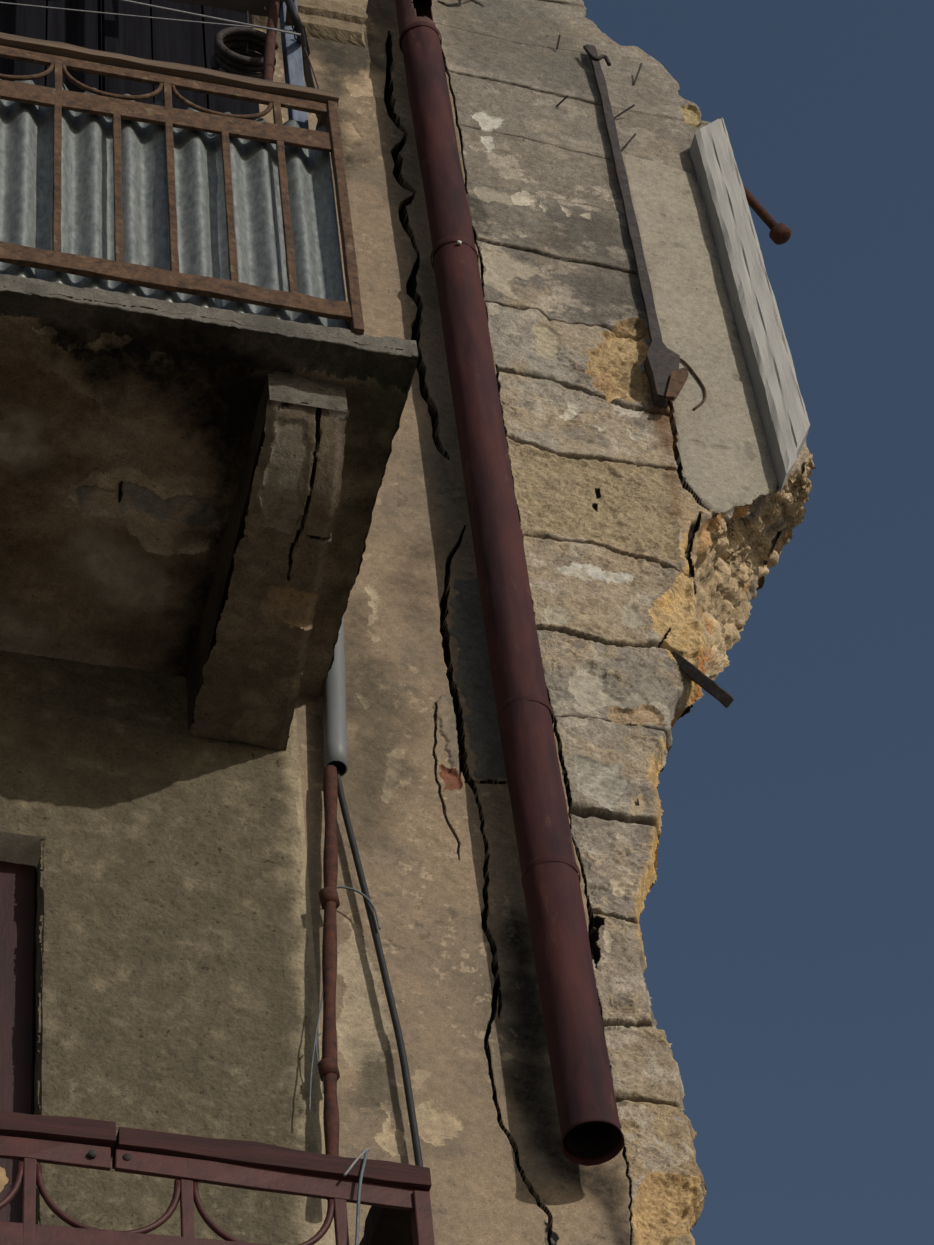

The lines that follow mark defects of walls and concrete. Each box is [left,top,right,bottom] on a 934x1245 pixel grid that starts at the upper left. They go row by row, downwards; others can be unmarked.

crack [384,30,449,460]
spalling [67,465,221,556]
crack [278,402,331,581]
crack [668,401,710,594]
flaking render [508,439,816,918]
crack [658,628,671,648]
crack [432,525,552,1245]